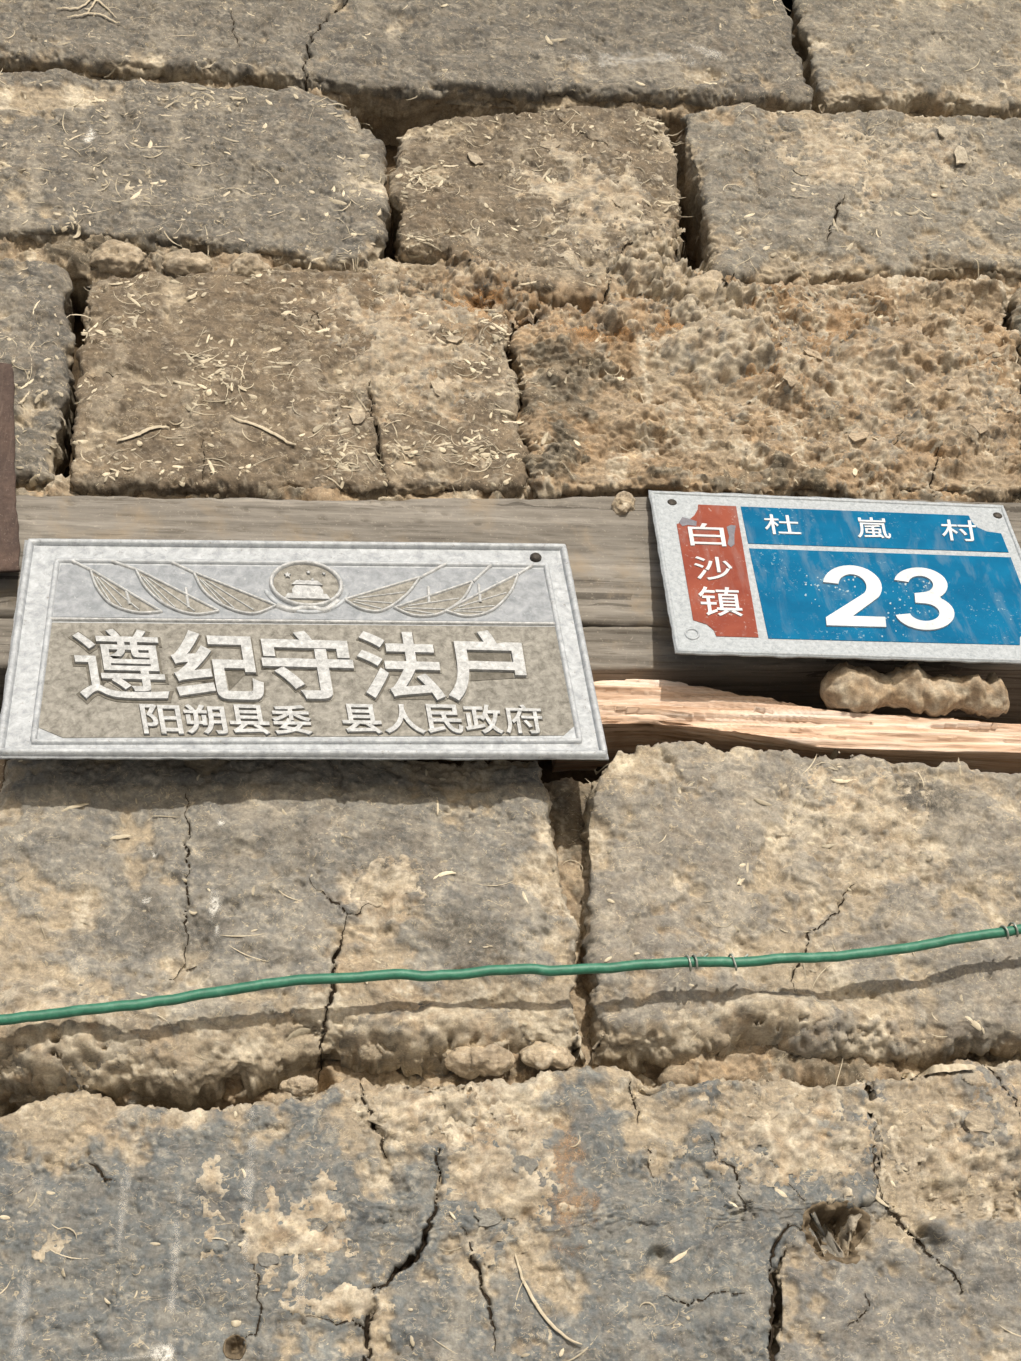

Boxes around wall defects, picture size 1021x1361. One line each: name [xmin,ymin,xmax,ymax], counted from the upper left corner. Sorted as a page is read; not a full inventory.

crack [302,0,348,92]
crack [169,793,203,980]
crack [309,878,369,1082]
crack [791,884,855,991]
crack [360,1083,387,1159]
crack [308,1148,496,1361]
crack [872,1116,964,1292]